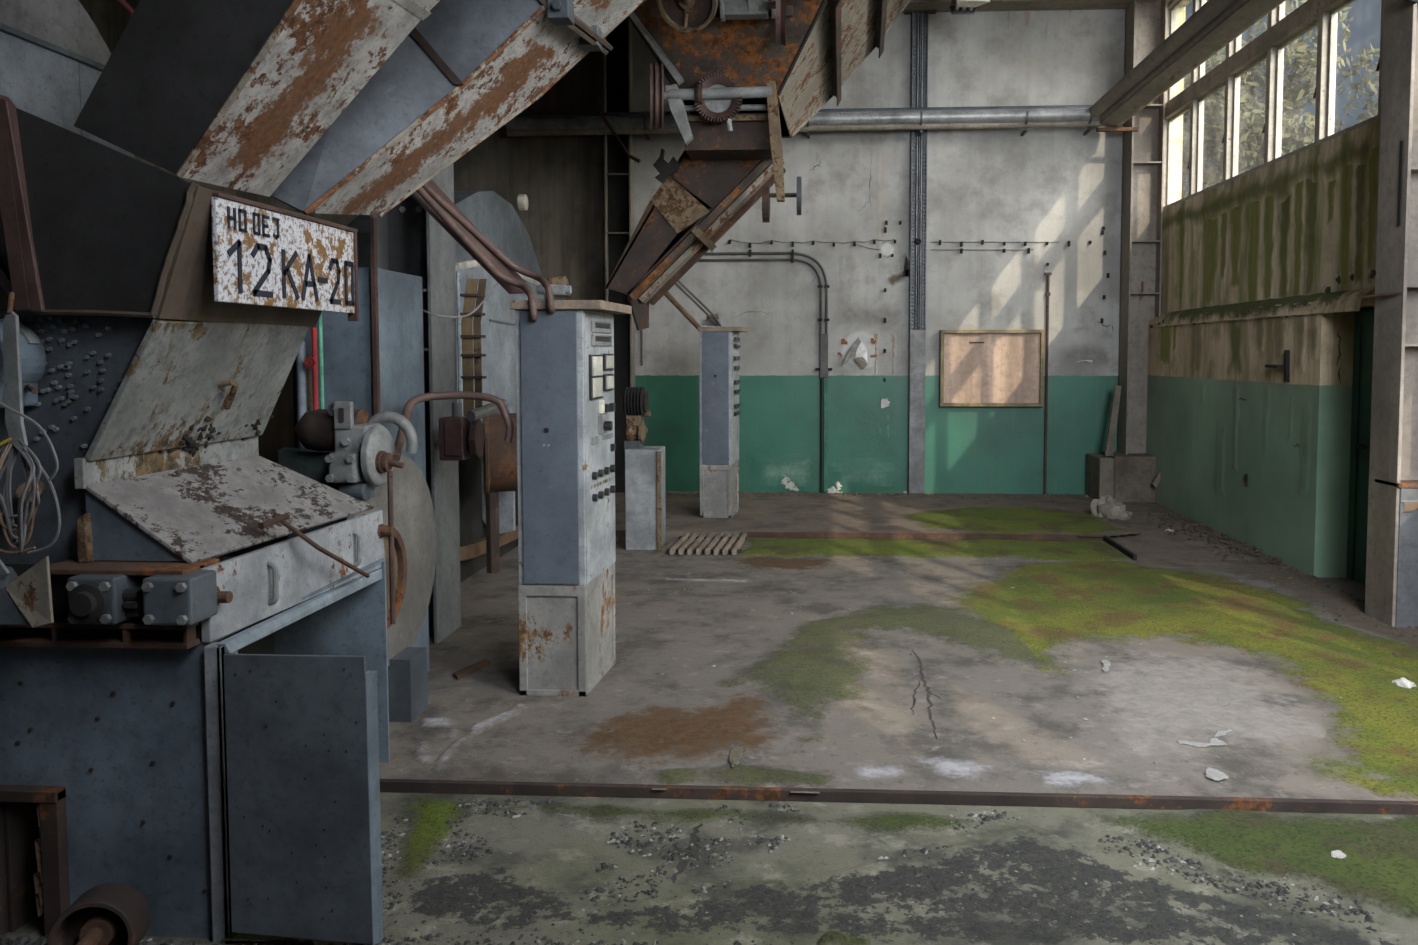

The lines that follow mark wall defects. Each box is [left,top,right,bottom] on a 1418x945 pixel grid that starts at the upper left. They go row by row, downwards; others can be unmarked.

leakage [1159,124,1380,501]
crack [910,650,941,739]